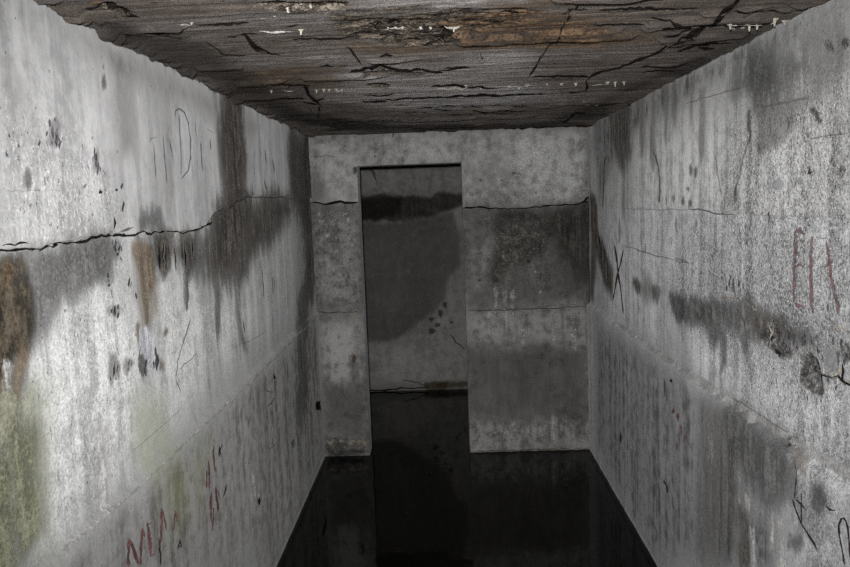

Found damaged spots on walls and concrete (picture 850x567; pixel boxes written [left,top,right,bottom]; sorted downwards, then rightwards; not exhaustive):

crack [126,21,279,56]
crack [288,0,778,130]
corrosion [0,254,35,481]
water stain [22,189,114,349]
crack [0,217,212,252]
corrosion [133,240,156,339]
crack [311,200,358,210]
water stain [100,23,631,444]
water stain [633,279,660,303]
peeling [719,274,744,299]
water stain [670,293,810,370]
spalling [758,311,850,402]